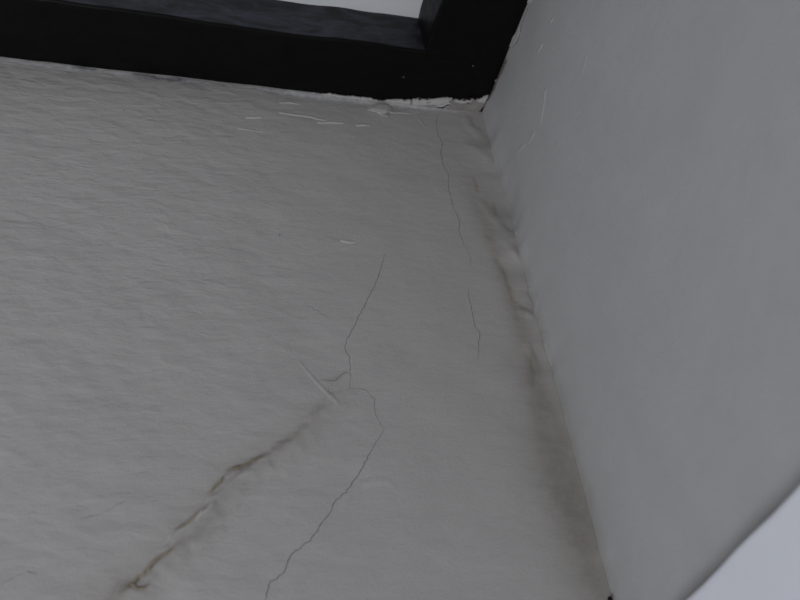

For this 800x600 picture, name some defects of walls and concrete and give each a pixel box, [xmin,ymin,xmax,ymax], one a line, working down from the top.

crack [426,102,471,263]
crack [264,254,385,600]